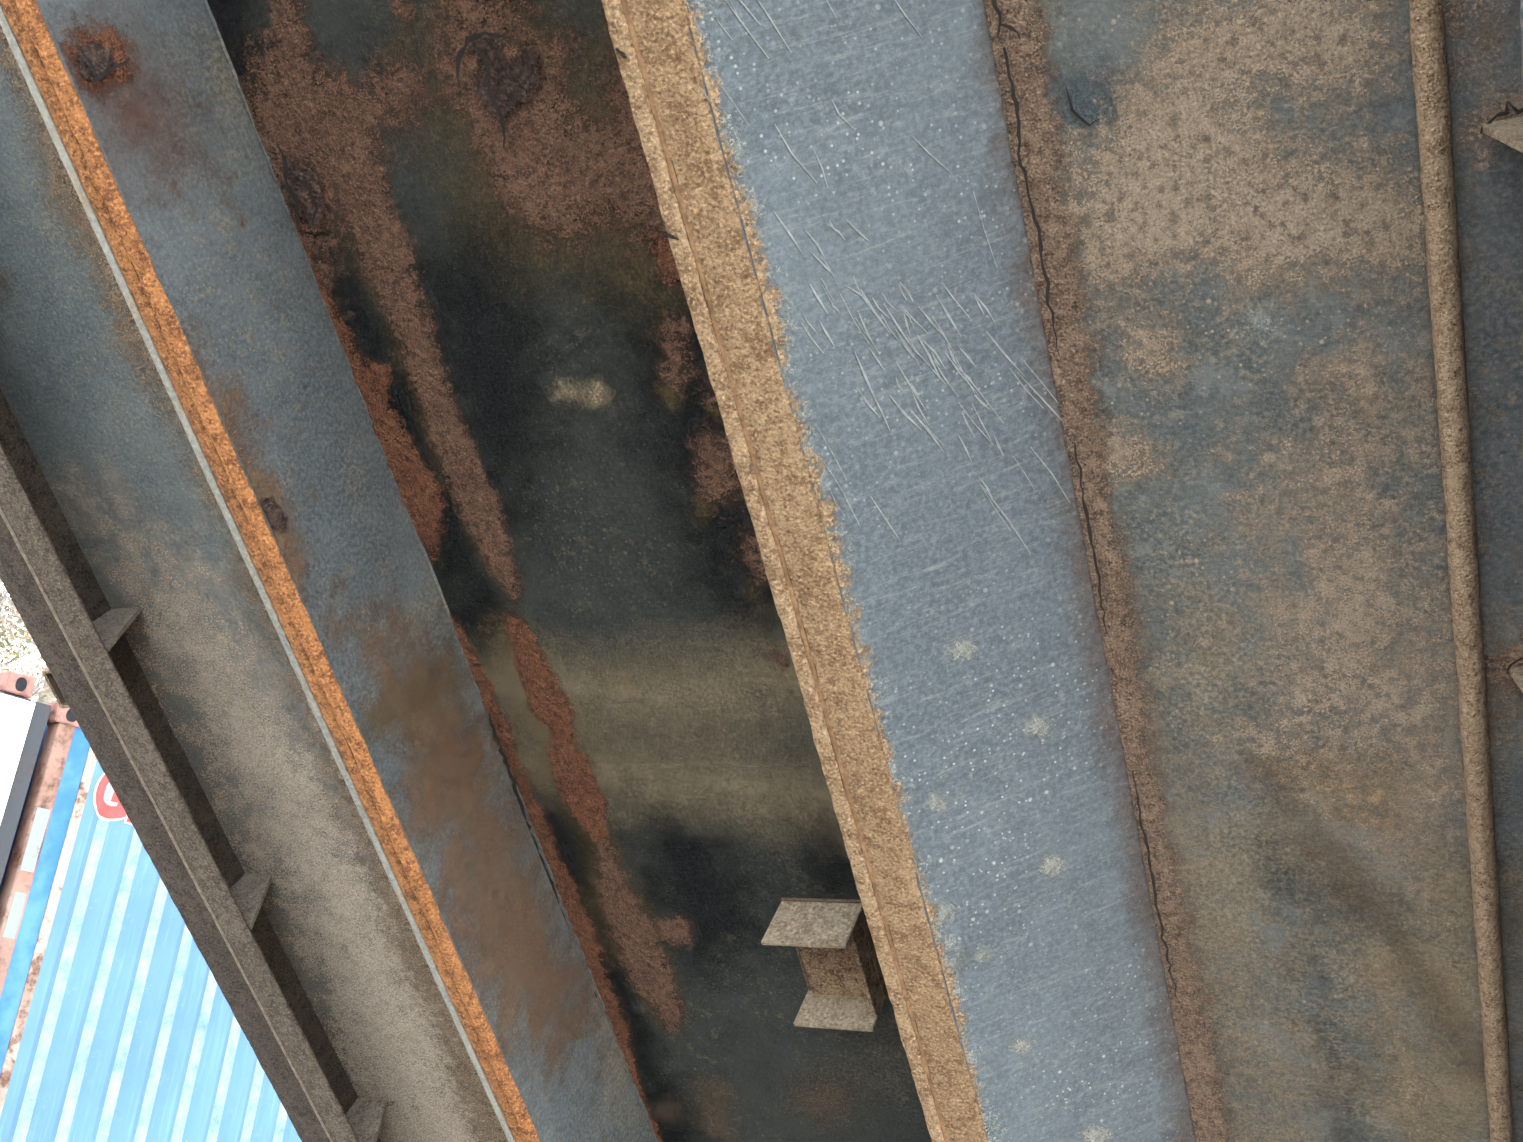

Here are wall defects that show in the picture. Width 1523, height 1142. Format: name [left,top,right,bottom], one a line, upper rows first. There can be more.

corrosion [0,11,509,1142]
corrosion [231,0,697,1142]
corrosion [646,310,770,588]